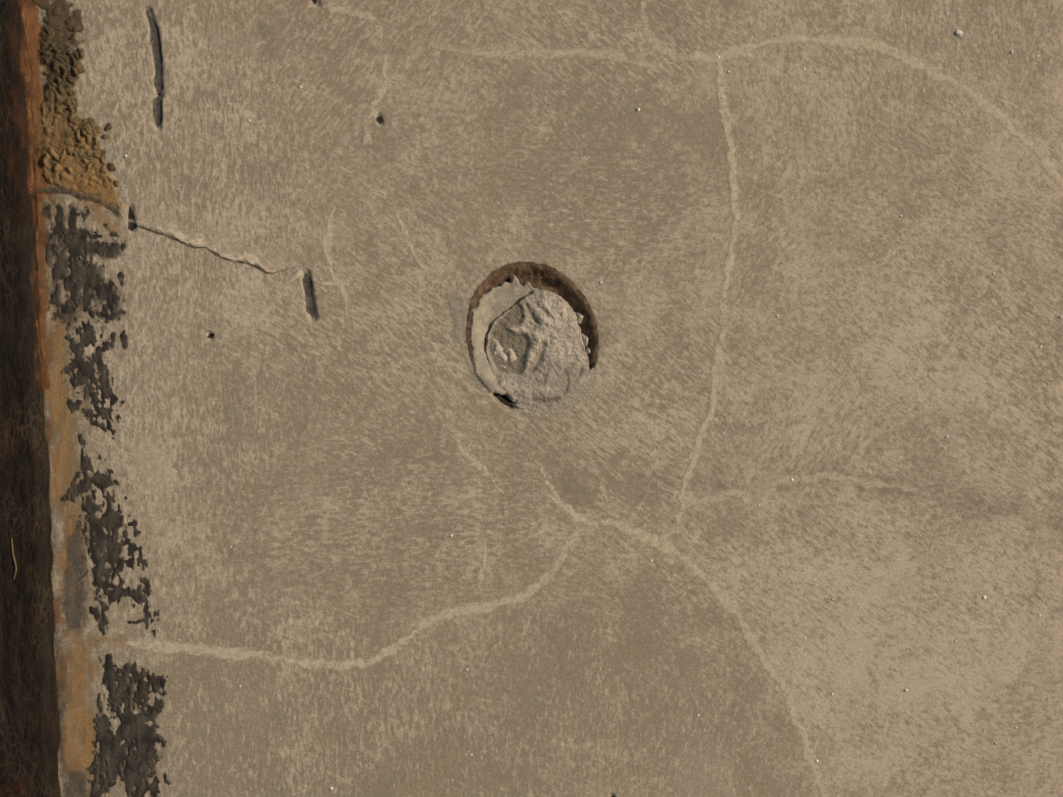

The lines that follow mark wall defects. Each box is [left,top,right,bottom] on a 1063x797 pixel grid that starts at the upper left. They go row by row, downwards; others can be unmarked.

crack [362,54,390,145]
crack [418,37,657,72]
rust [7,0,78,534]
peeling [43,200,137,439]
crack [36,187,350,318]
crack [446,431,504,493]
peeling [491,338,517,368]
spalling [494,393,526,409]
peeling [575,312,590,354]
crack [539,0,1063,797]
peeling [60,433,171,797]
crack [118,527,582,673]